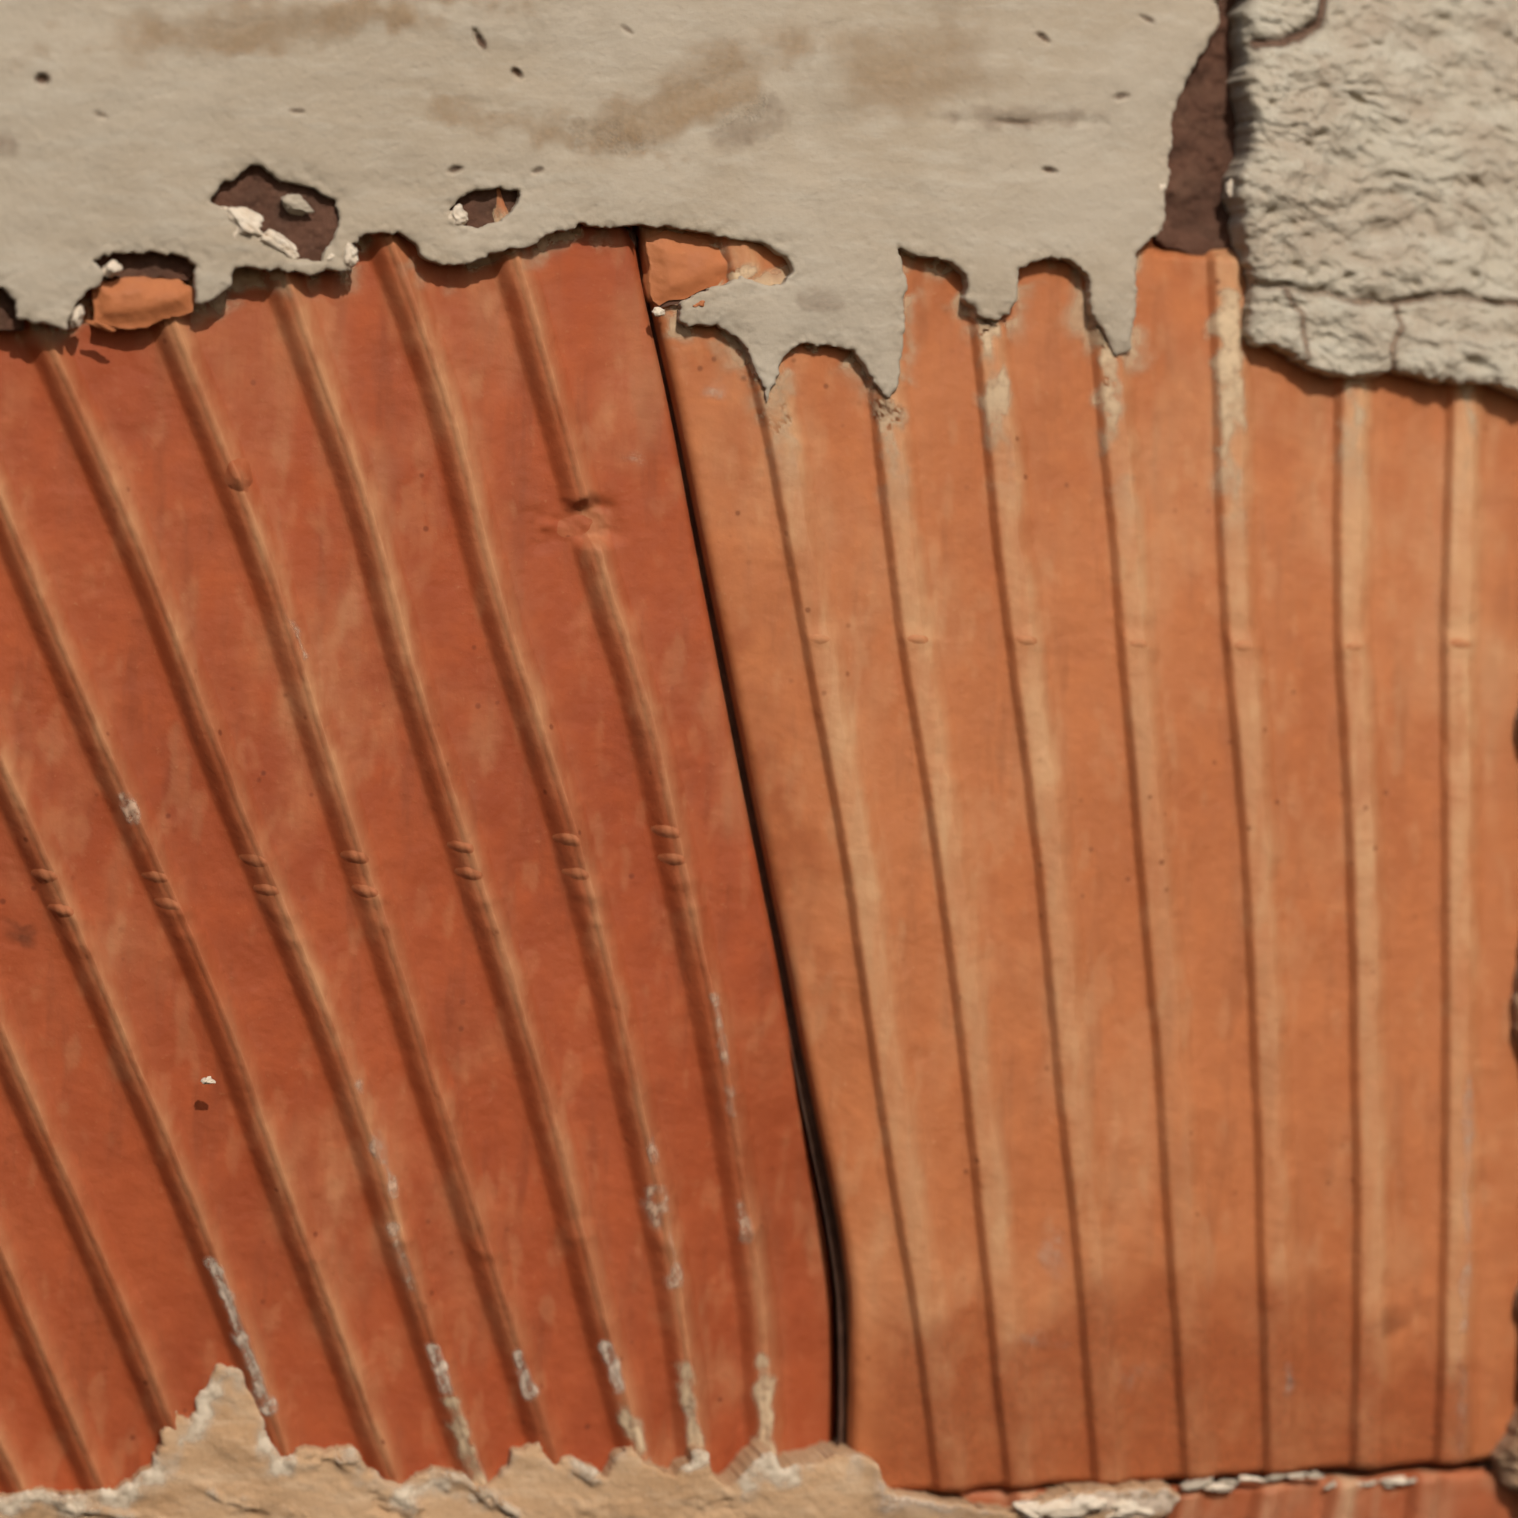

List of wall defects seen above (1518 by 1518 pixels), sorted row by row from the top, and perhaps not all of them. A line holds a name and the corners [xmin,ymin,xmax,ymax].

spalling [210,165,358,272]
spalling [0,288,25,331]
spalling [71,252,195,332]
spalling [642,230,728,317]
crack [624,226,848,1446]
peeling [1203,1471,1325,1492]
peeling [1356,1476,1417,1489]
peeling [1011,1500,1044,1518]
peeling [1105,1499,1156,1518]